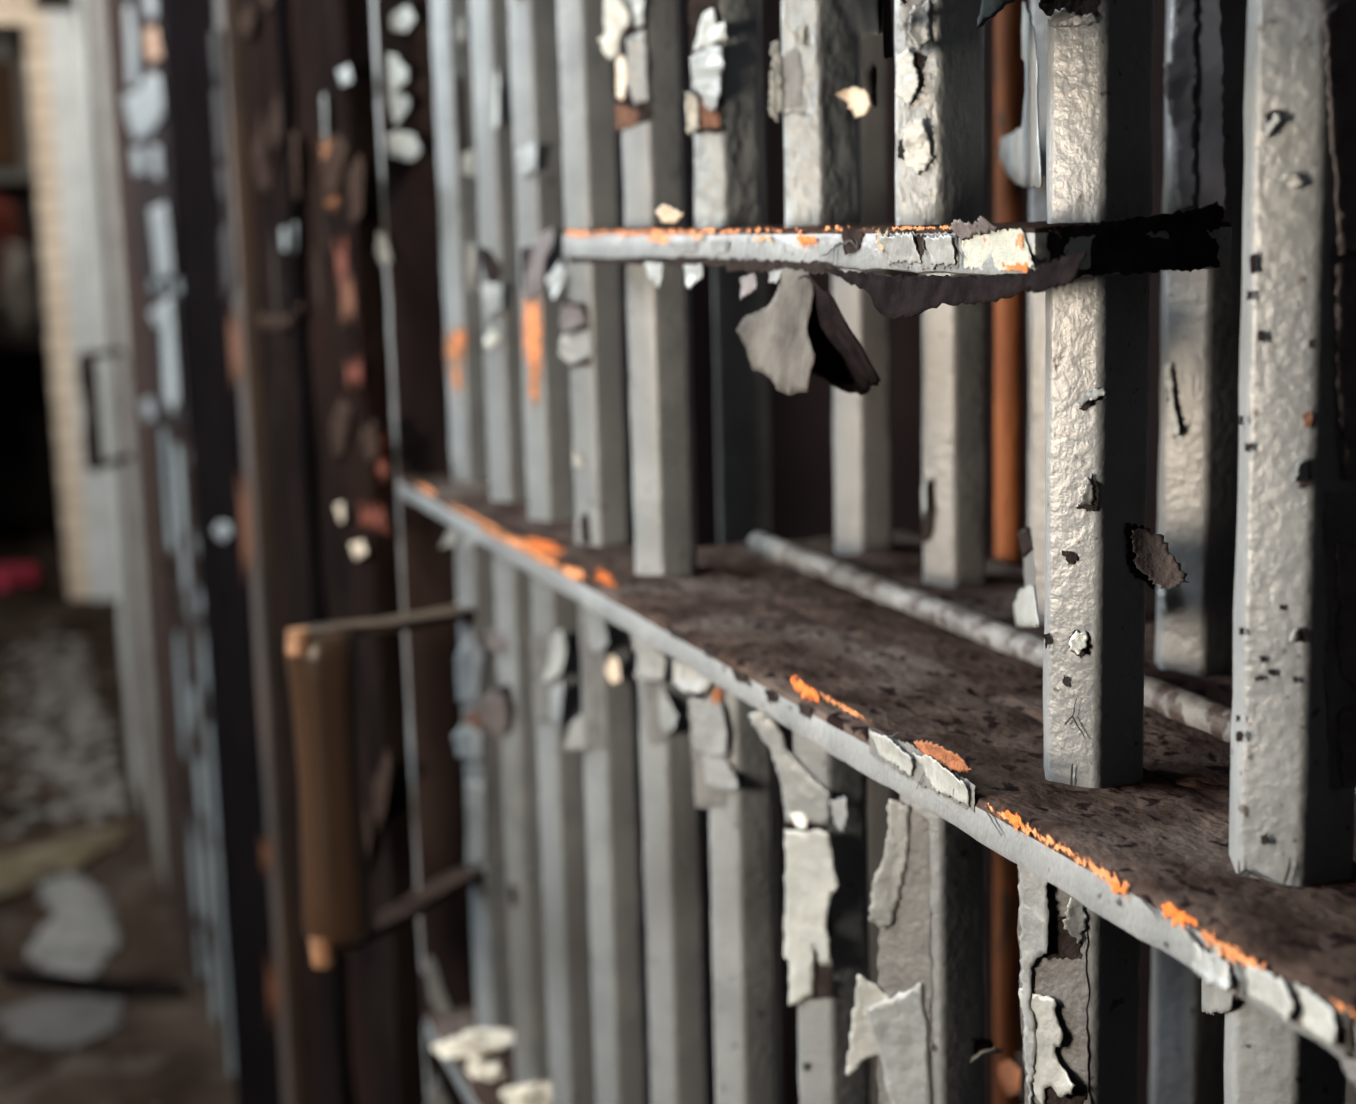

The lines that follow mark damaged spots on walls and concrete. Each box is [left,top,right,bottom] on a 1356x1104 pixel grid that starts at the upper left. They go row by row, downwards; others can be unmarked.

peeling [515,144,538,177]
peeling [520,0,1225,396]
rust [566,225,849,248]
rust [876,225,951,252]
spalling [1249,252,1258,274]
rust [417,482,617,587]
spalling [1254,656,1276,682]
rust [985,803,1129,901]
peeling [845,799,932,1104]
peeling [971,865,1091,1104]
rust [1161,902,1265,971]
rust [1331,997,1356,1017]